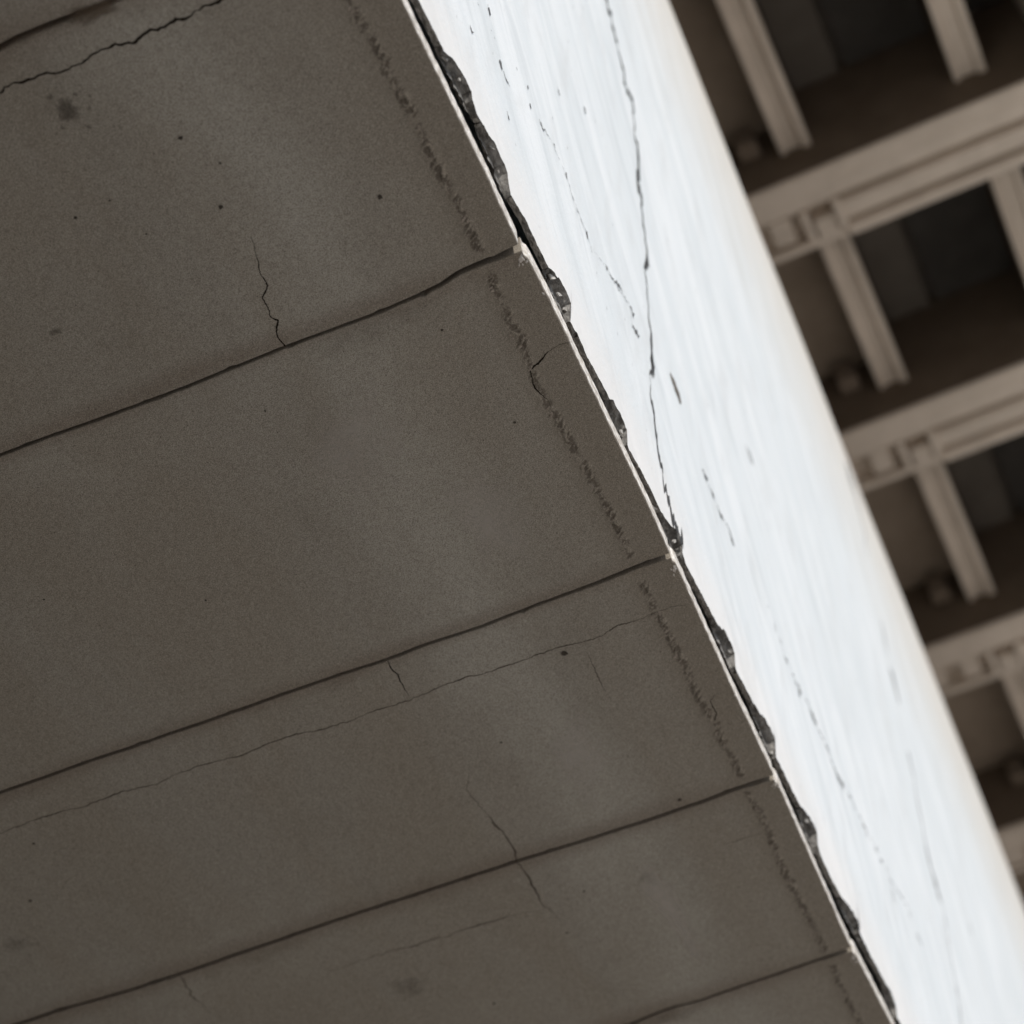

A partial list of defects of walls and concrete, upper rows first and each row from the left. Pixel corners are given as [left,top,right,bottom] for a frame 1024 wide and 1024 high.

crack [0,0,223,94]
crack [251,238,286,347]
crack [470,0,684,548]
crack [0,605,683,834]
crack [333,778,561,972]